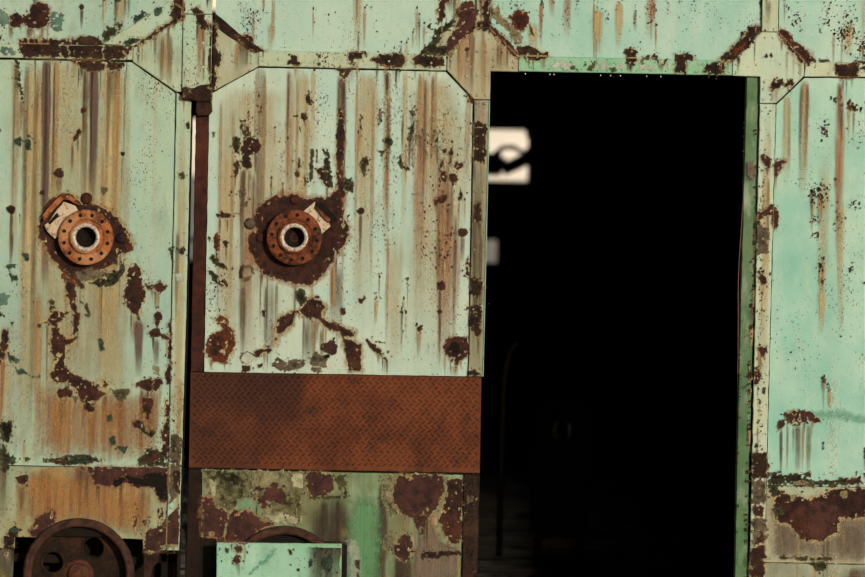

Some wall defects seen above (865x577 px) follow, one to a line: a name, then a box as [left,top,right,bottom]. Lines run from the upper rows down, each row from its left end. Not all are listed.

rust [623,19,766,79]
rust [0,0,224,510]
rust [204,0,549,376]
rust [755,154,787,290]
rust [769,29,865,264]
rust [745,330,768,402]
rust [0,455,56,555]
rust [135,498,183,555]
peeling [201,466,312,525]
rust [378,472,481,577]
rust [747,408,865,577]